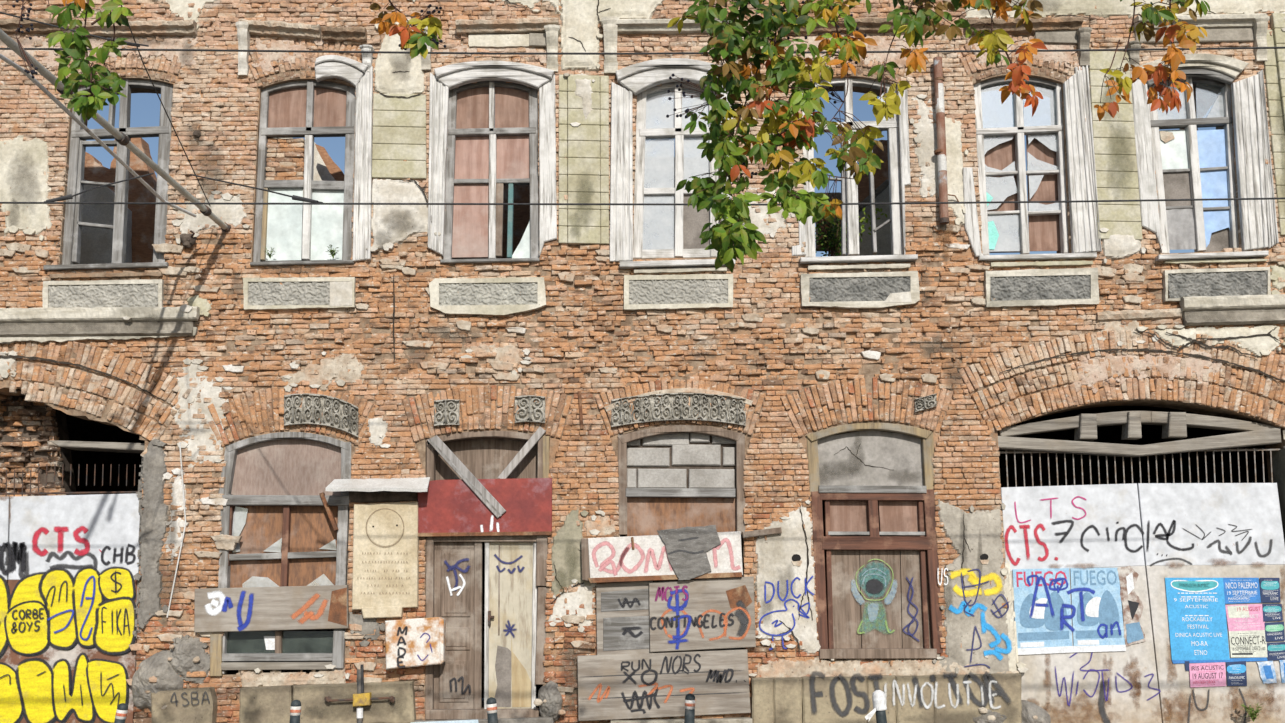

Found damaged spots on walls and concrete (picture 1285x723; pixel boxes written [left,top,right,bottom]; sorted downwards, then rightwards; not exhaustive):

flaking render [0,33,62,71]
flaking render [85,0,217,68]
flaking render [0,135,63,277]
spalling [126,94,1028,688]
spalling [1070,228,1285,394]
spalling [511,509,620,723]